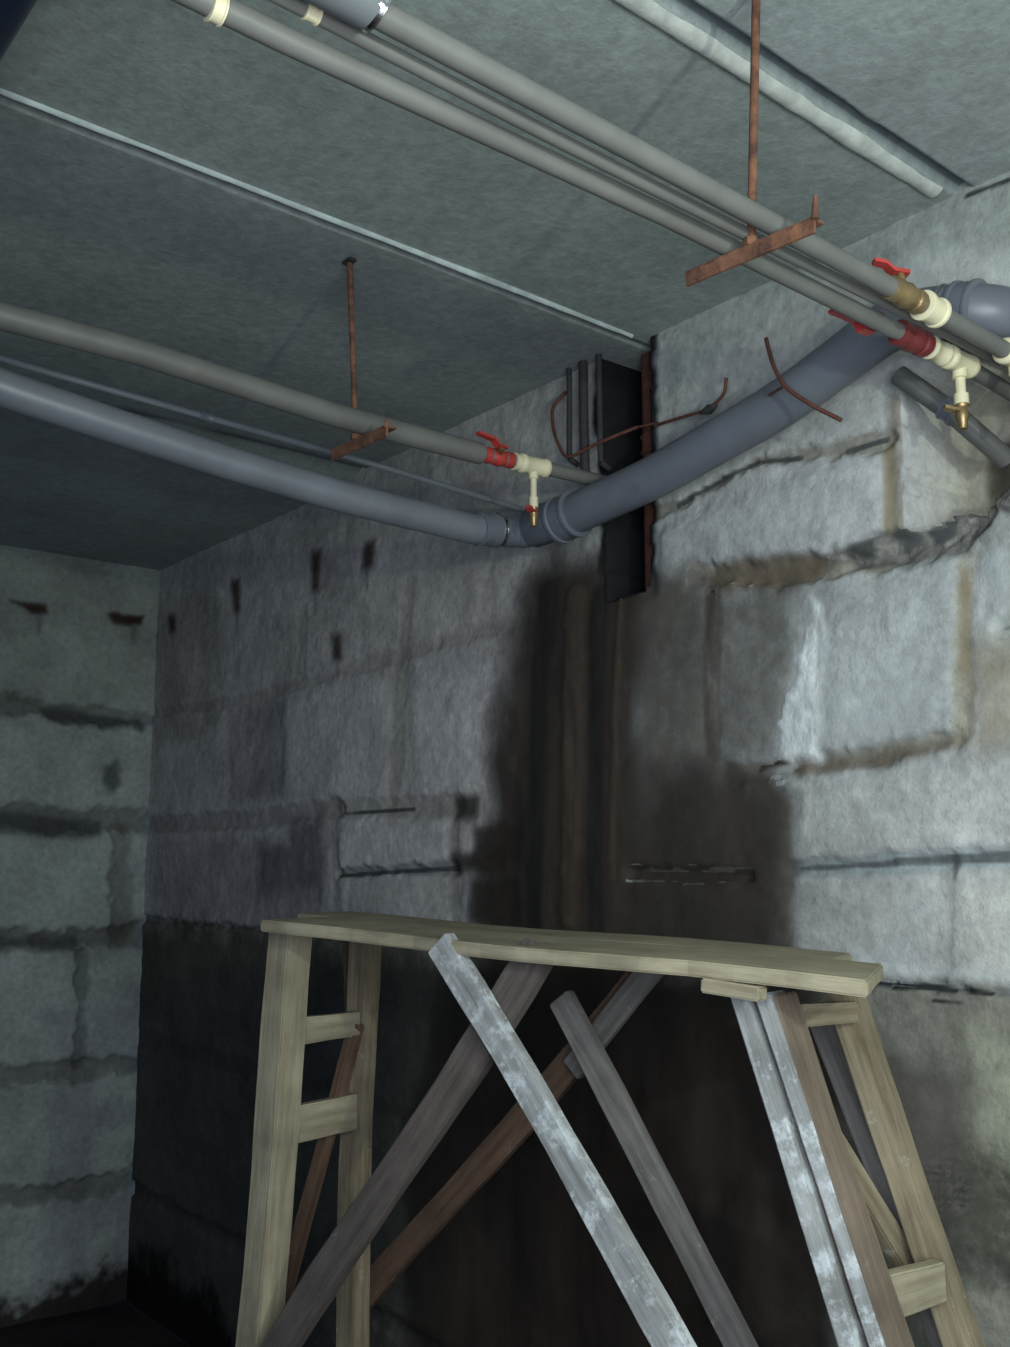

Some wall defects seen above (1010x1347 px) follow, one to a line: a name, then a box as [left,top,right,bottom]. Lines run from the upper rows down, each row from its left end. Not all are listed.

spalling [827,516,989,567]